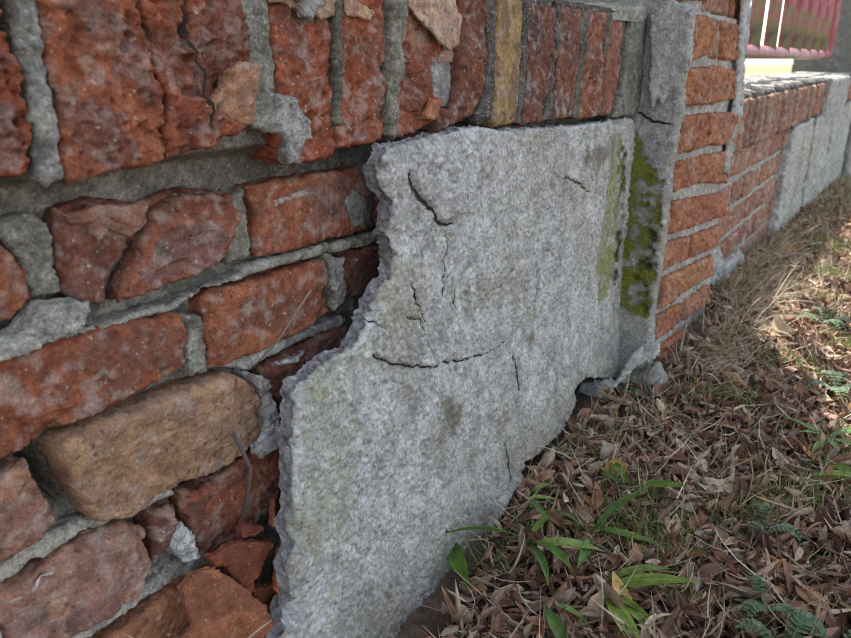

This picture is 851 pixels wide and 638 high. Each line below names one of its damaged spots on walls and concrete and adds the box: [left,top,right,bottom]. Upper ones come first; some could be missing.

spalling [0,31,33,178]
spalling [35,0,261,185]
crack [179,0,216,128]
peeling [57,191,242,304]
crack [406,284,426,329]
crack [408,173,457,310]
crack [373,342,520,391]
peeling [177,0,751,638]